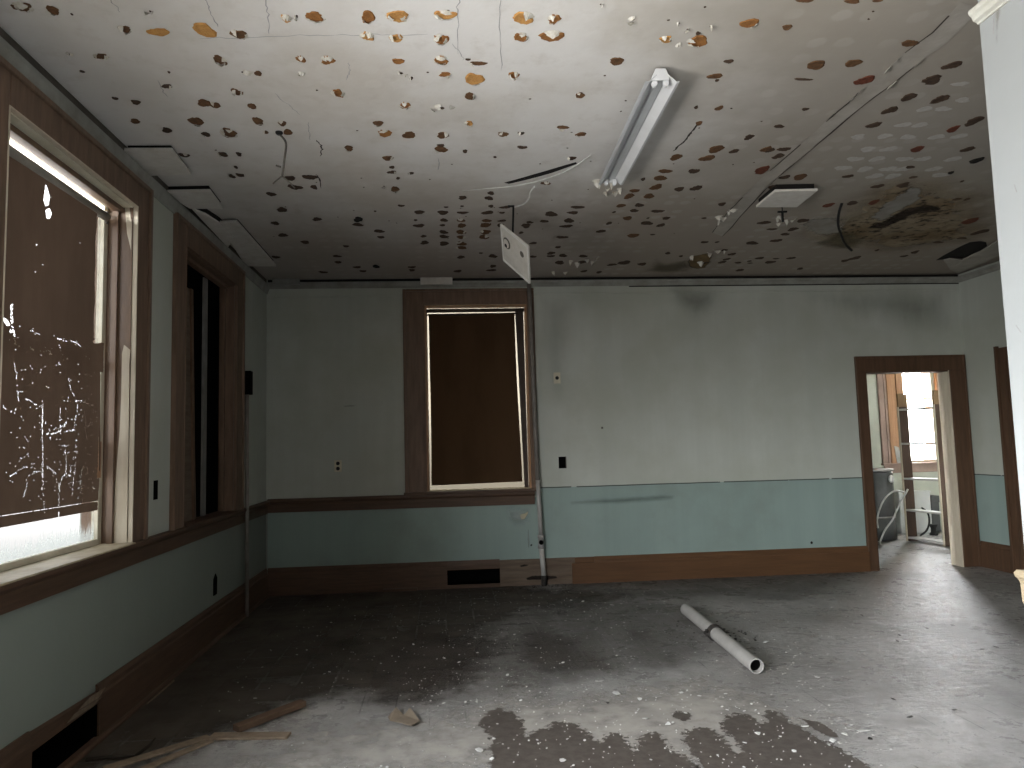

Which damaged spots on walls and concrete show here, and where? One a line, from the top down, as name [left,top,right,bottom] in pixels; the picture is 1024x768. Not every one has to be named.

peeling [544,15,560,39]
peeling [662,22,699,48]
crack [674,125,697,151]
damp [822,186,966,247]
peeling [872,188,921,221]
damp [478,707,871,768]